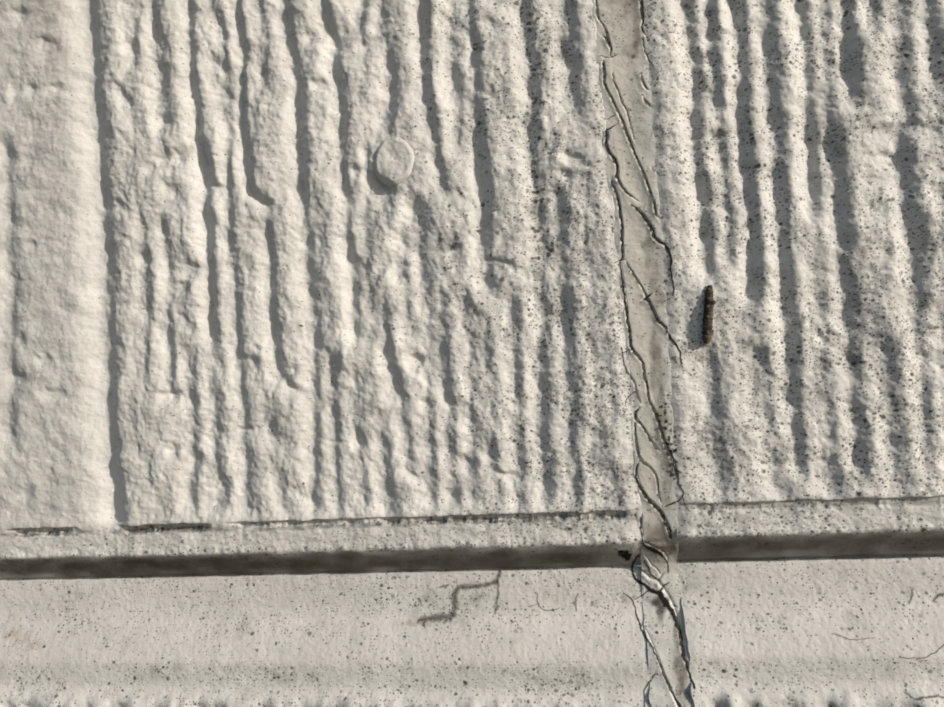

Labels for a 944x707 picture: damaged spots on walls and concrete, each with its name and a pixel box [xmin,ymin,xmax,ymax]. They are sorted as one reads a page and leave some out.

crack [418,571,501,625]
crack [596,0,696,707]